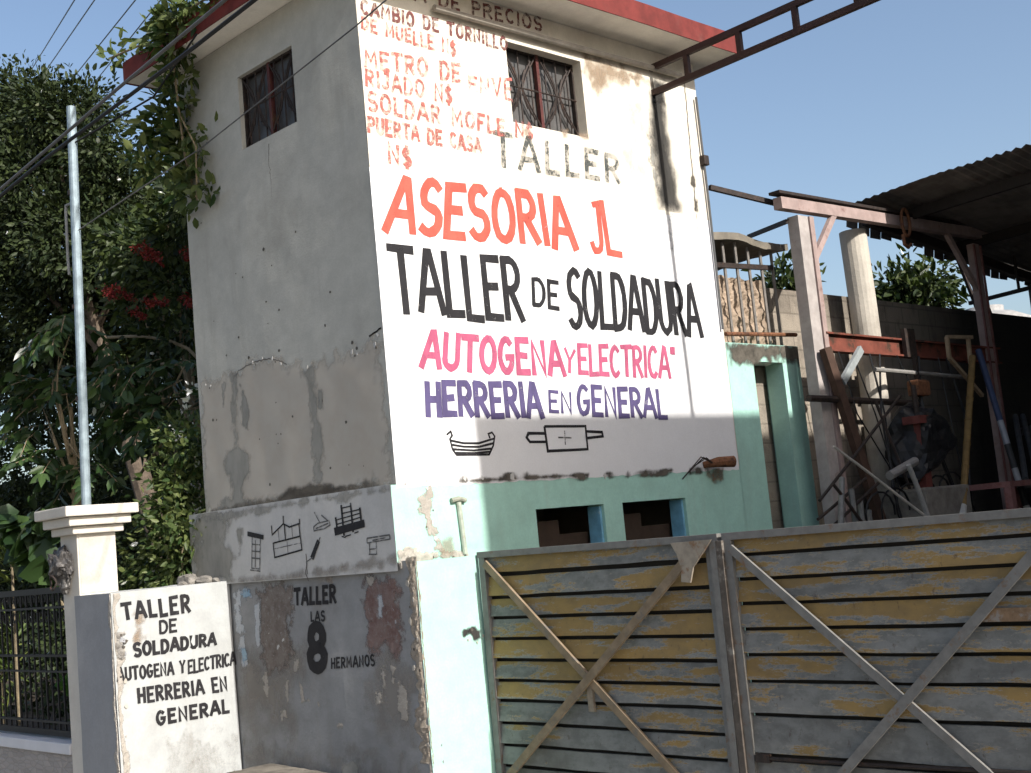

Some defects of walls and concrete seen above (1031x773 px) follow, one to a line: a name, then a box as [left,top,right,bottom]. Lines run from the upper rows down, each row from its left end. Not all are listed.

leakage [650,79,680,211]
peeling [417,479,463,559]
peeling [460,473,589,483]
peeling [626,469,672,477]
spalling [108,593,130,773]
peeling [233,581,295,676]
peeling [360,556,444,773]
spalling [463,627,484,644]